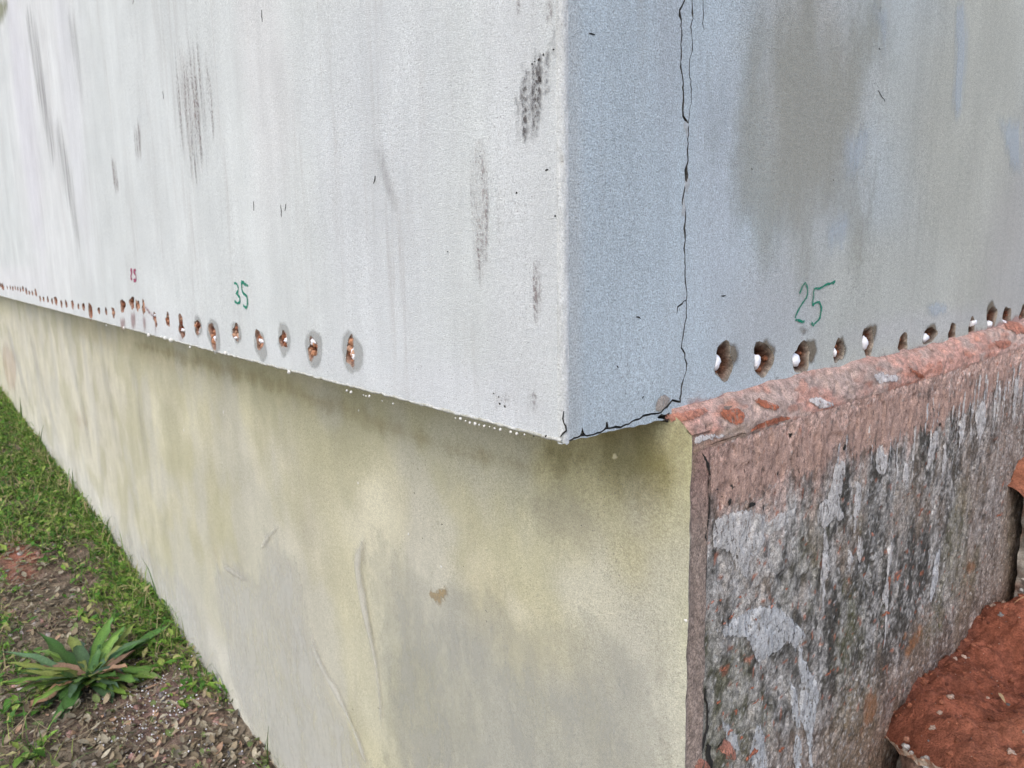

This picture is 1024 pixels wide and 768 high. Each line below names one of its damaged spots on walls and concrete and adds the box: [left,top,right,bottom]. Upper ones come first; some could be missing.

leakage [177,48,213,147]
leakage [520,54,548,137]
crack [560,0,704,441]
leakage [148,565,195,646]